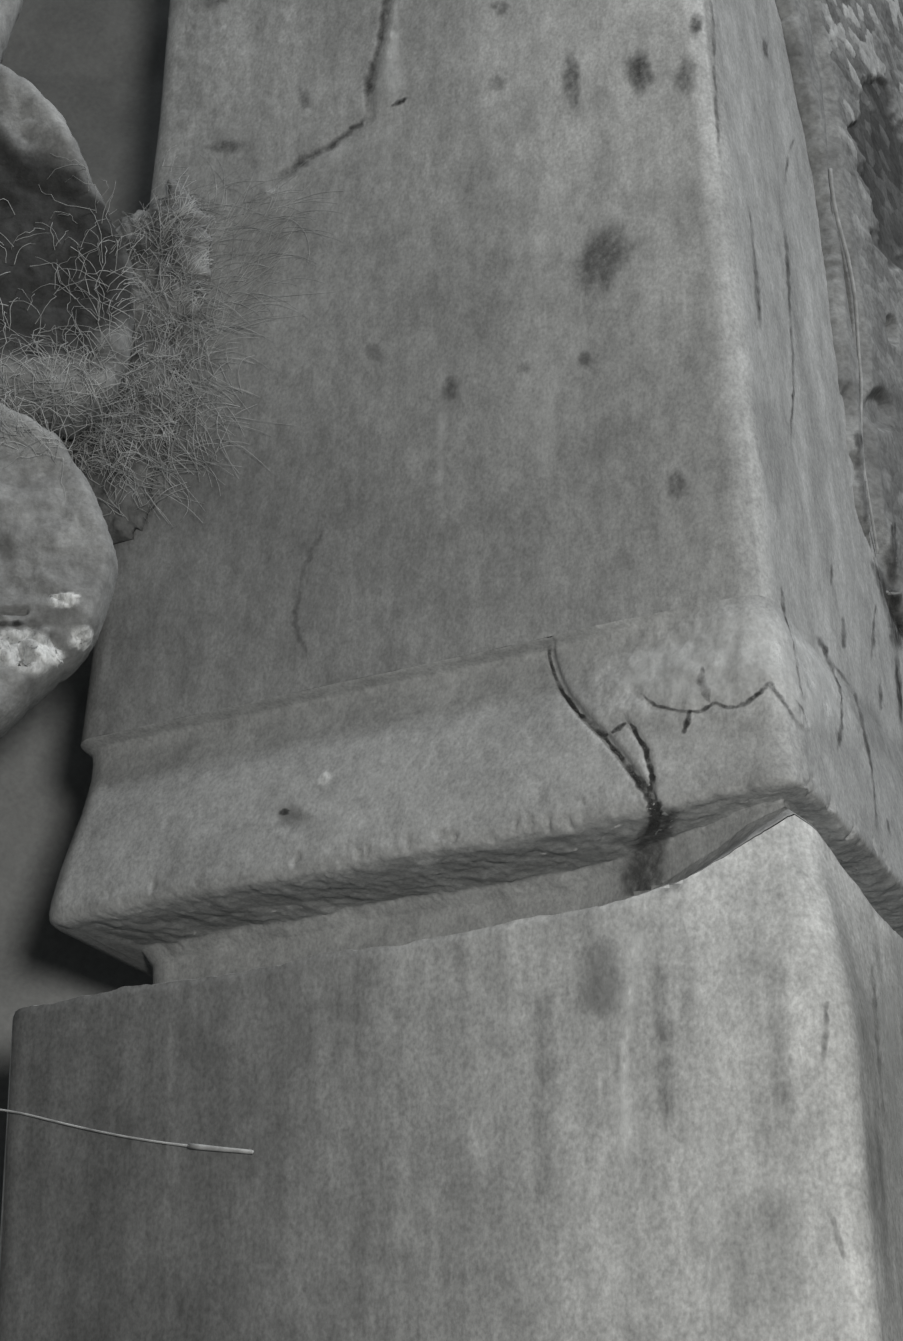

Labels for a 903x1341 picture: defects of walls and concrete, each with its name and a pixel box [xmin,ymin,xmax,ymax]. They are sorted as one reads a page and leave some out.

crack [367,15,406,104]
crack [548,592,843,827]